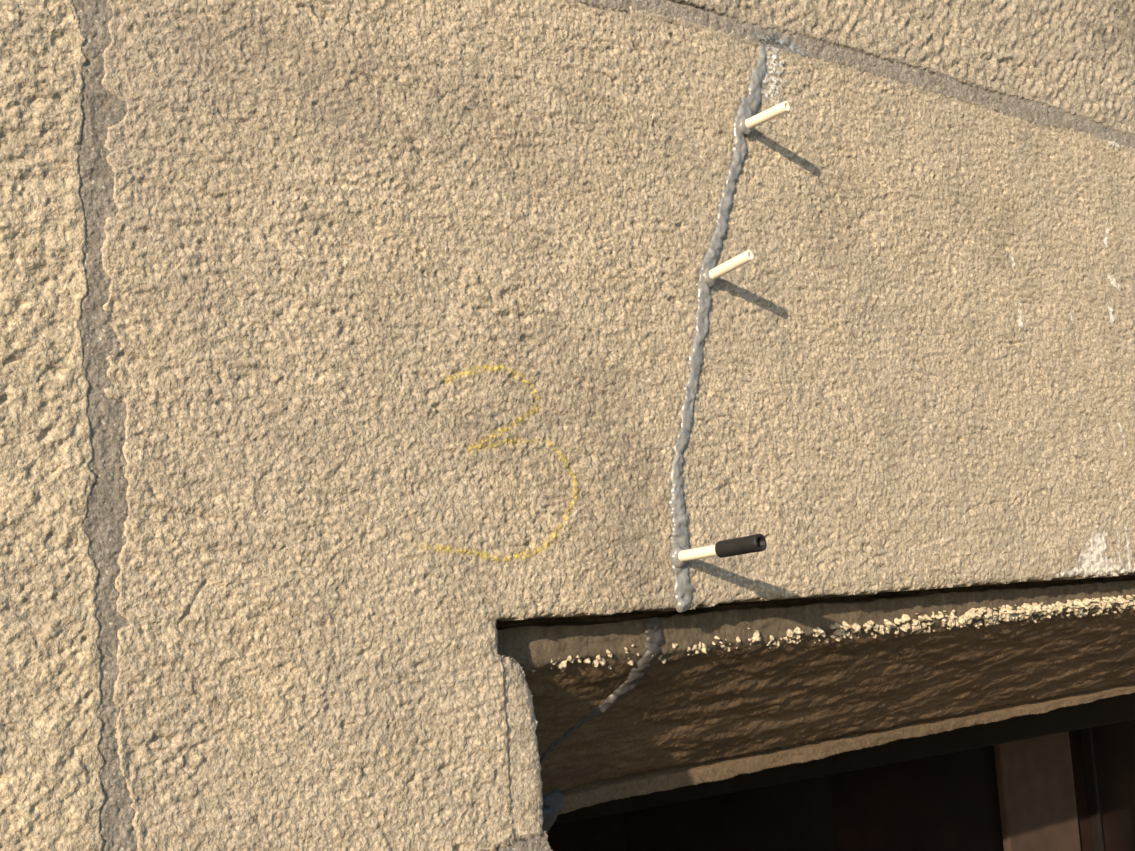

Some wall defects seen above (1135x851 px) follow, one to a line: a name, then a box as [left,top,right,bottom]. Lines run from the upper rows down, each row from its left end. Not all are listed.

crack [540,32,1057,764]
damp [1056,525,1135,577]